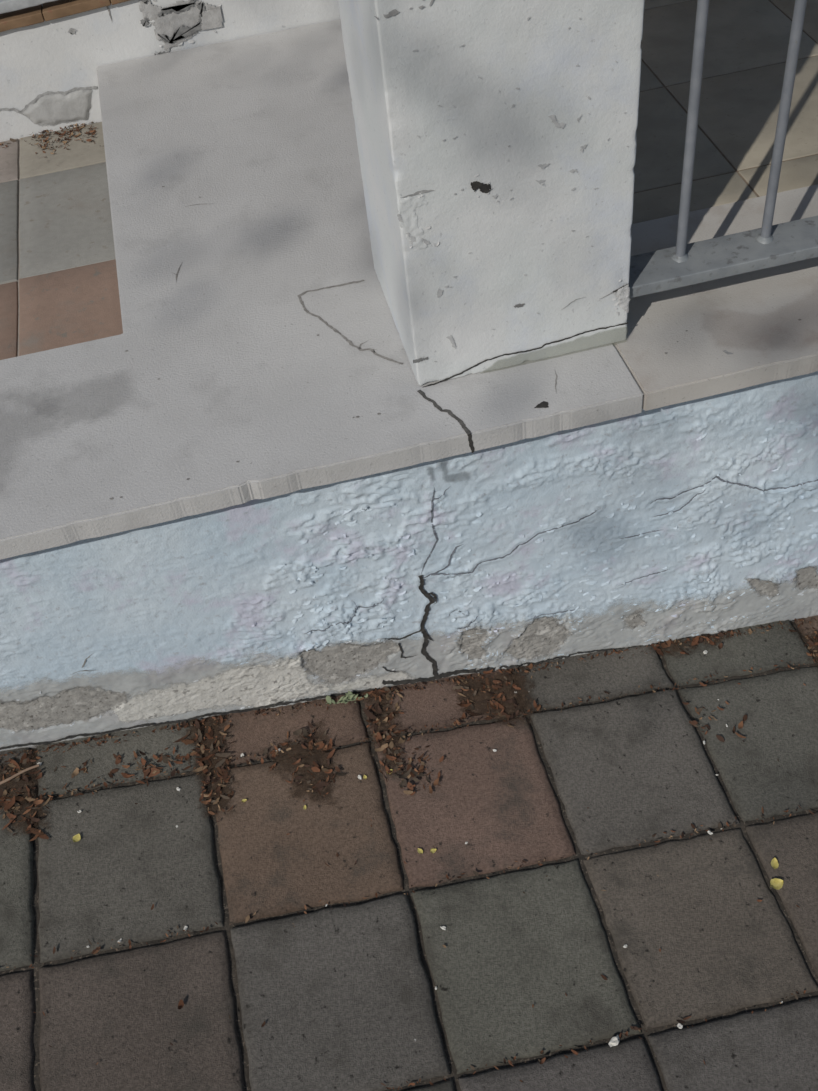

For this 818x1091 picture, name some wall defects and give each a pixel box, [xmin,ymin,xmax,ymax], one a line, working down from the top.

flaking render [139,0,223,55]
crack [297,280,403,364]
crack [417,322,628,453]
crack [621,476,818,539]
peeling [0,562,415,734]
crack [0,487,738,750]
flaking render [440,542,659,663]